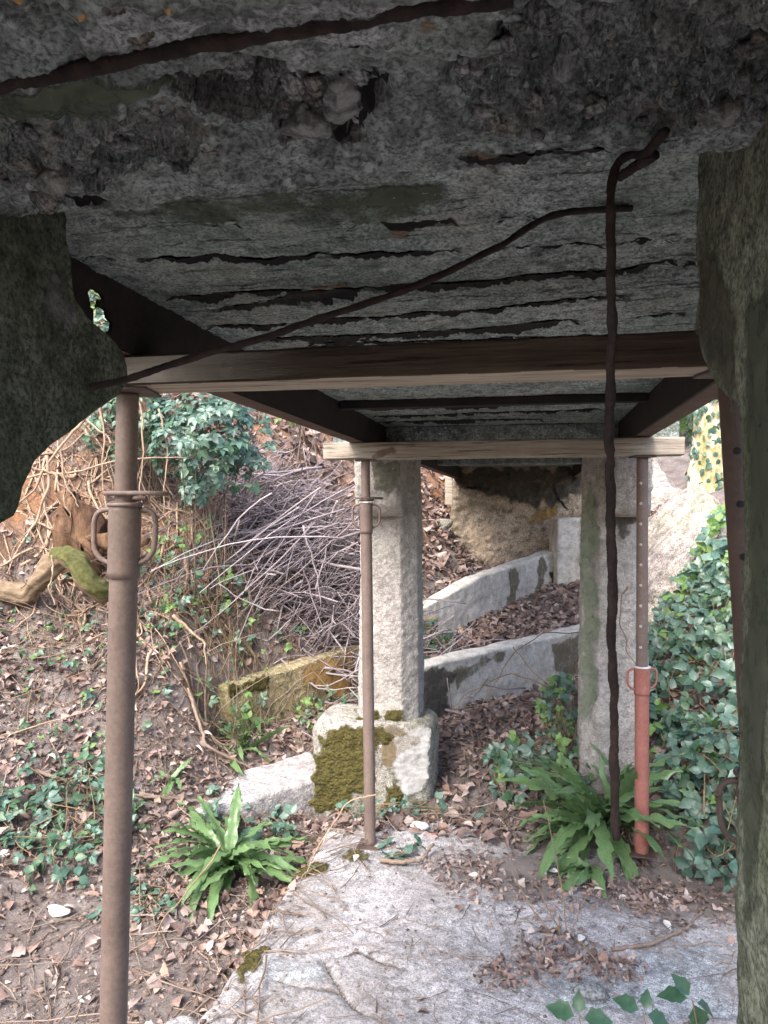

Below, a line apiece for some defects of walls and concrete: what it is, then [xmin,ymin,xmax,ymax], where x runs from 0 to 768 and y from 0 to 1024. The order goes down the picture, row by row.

damp [0,74,169,121]
spalling [0,0,514,215]
damp [150,184,443,227]
crack [442,144,629,166]
crack [70,216,697,349]
spalling [88,0,768,841]